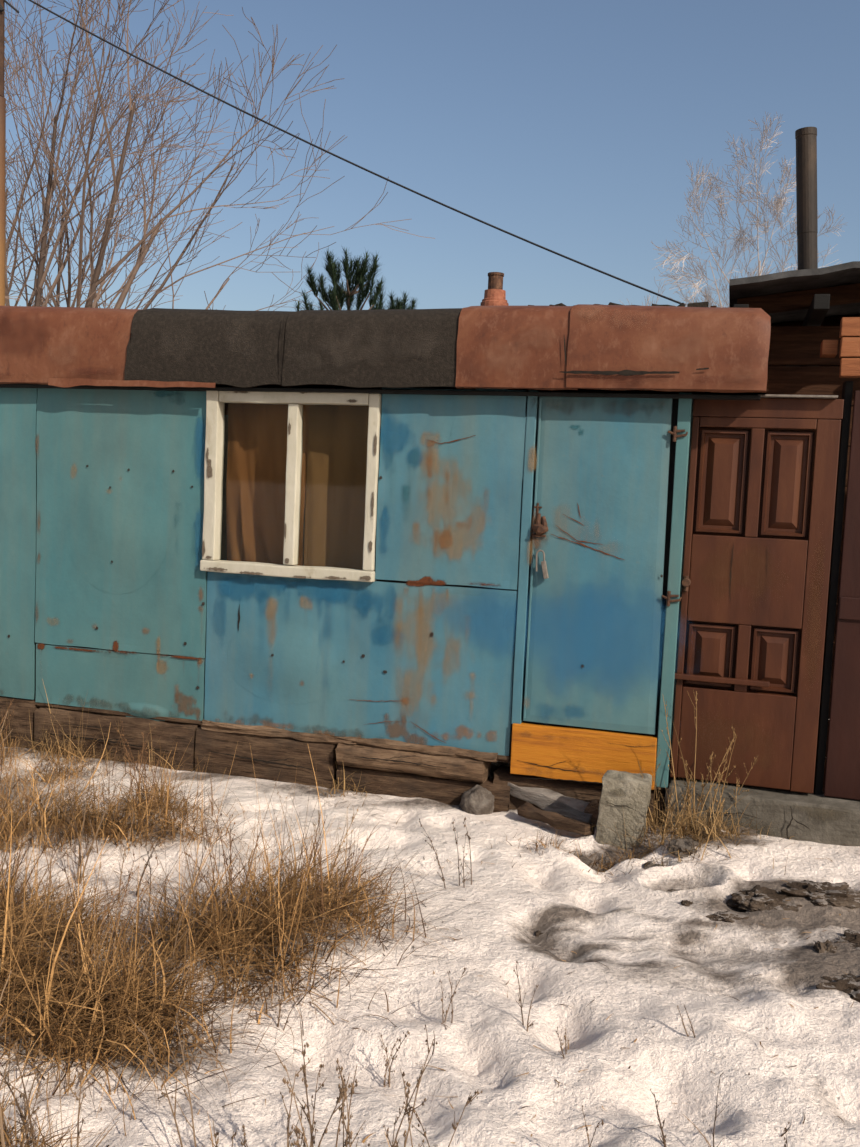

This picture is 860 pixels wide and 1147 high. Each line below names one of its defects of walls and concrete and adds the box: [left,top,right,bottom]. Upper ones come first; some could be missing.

rust [406,576,445,587]
rust [37,641,135,654]
rust [385,715,424,745]